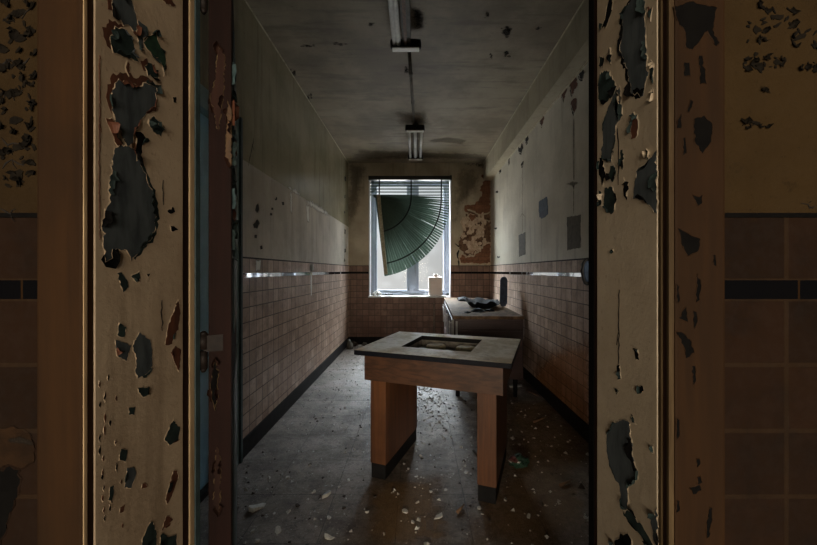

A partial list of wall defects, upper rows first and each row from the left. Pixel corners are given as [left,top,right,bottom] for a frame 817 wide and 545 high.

peeling [0,0,37,188]
peeling [101,0,177,292]
peeling [208,41,239,224]
peeling [596,0,659,215]
peeling [673,1,720,84]
peeling [742,0,817,73]
peeling [456,171,500,265]
peeling [115,322,153,397]
peeling [98,375,147,528]
peeling [141,515,177,545]
peeling [164,420,180,446]
peeling [606,415,659,545]